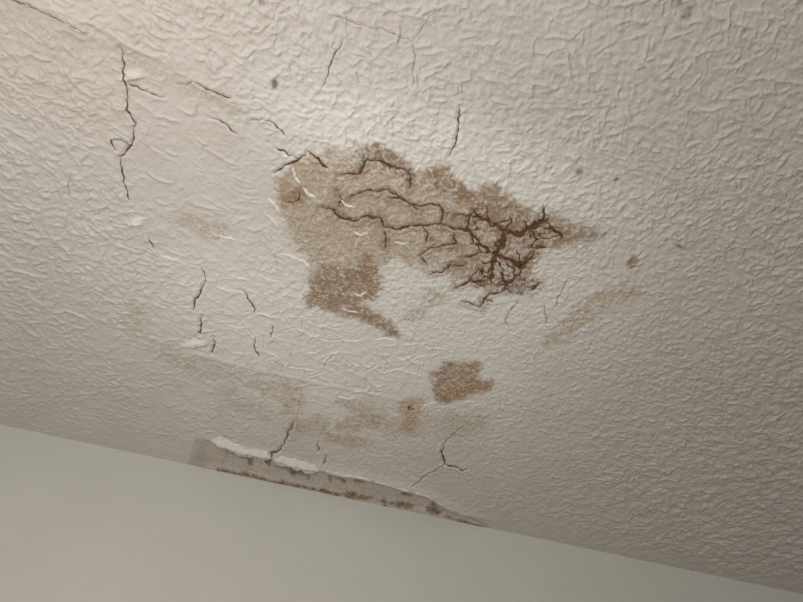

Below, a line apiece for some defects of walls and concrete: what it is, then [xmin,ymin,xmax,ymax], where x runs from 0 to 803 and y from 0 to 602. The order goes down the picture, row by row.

crack [110,49,159,199]
crack [253,119,563,325]
water stain [275,143,599,337]
crack [193,268,216,353]
water stain [433,362,492,403]
crack [270,422,294,458]
peeling [197,437,488,528]
crack [412,426,466,487]